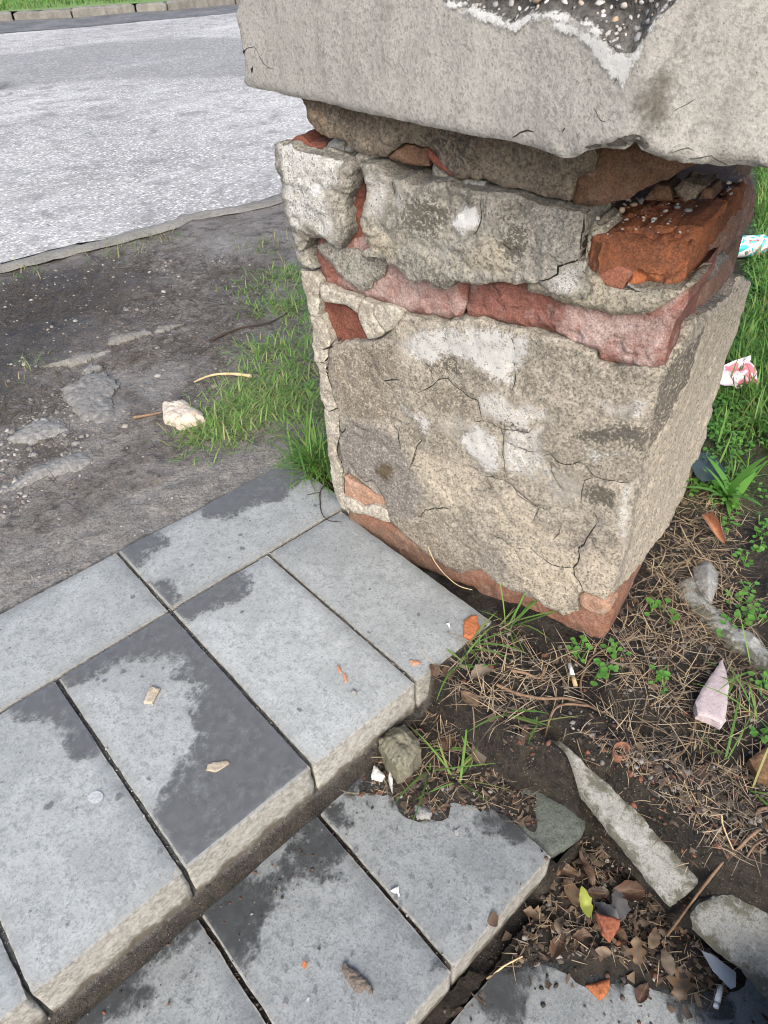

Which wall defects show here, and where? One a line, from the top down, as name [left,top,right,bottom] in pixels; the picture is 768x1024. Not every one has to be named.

spalling [445,0,676,53]
spalling [585,134,649,150]
crack [321,337,383,496]
flaking render [300,268,407,522]
crack [375,358,627,590]